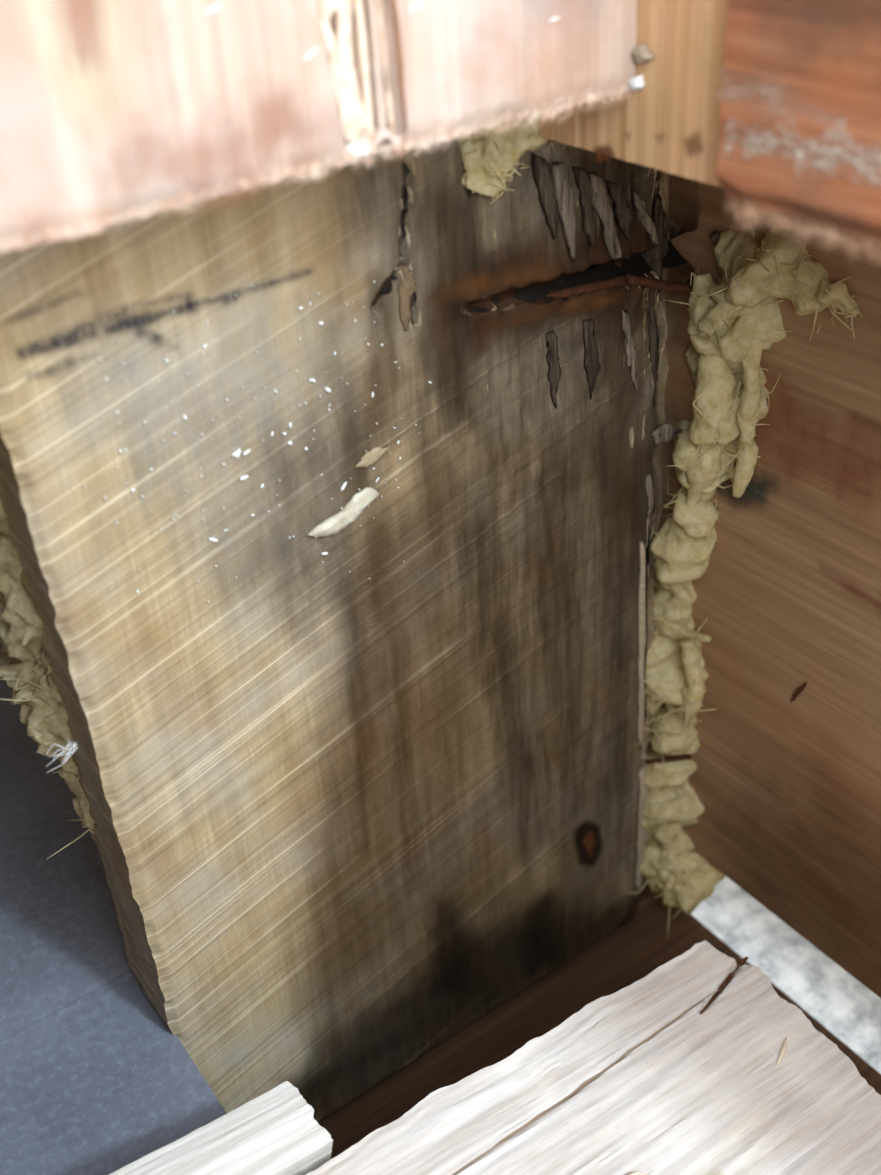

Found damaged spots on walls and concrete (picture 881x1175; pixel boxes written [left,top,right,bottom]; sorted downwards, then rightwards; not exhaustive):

spalling [318,0,408,158]
water stain [20,301,198,356]
crack [372,148,417,332]
water stain [362,137,666,878]
water stain [298,618,638,1117]
crack [453,956,749,1175]